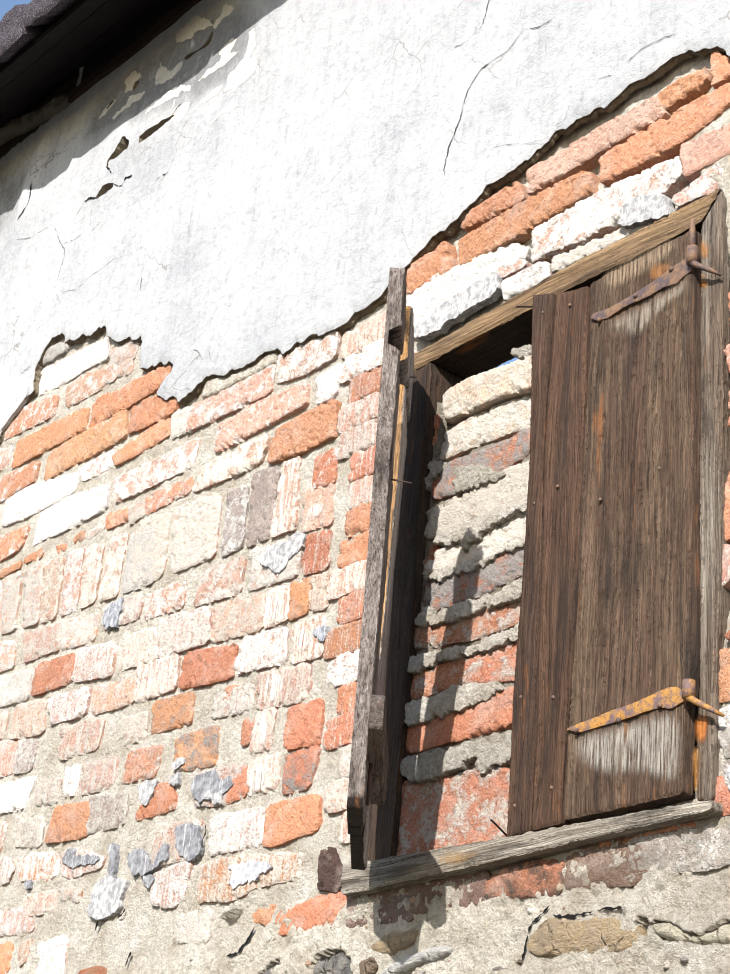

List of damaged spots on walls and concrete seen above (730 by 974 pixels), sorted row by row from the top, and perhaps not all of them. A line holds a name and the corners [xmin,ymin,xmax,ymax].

peeling [99,70,145,134]
peeling [145,28,259,125]
crack [443,18,553,174]
spalling [404,46,730,276]
peeling [414,272,504,341]
spalling [25,286,388,406]
peeling [259,531,307,573]
rust [697,717,706,740]
peeling [137,757,234,806]
peeling [62,822,205,921]
peeling [228,859,273,889]
crack [522,904,624,960]